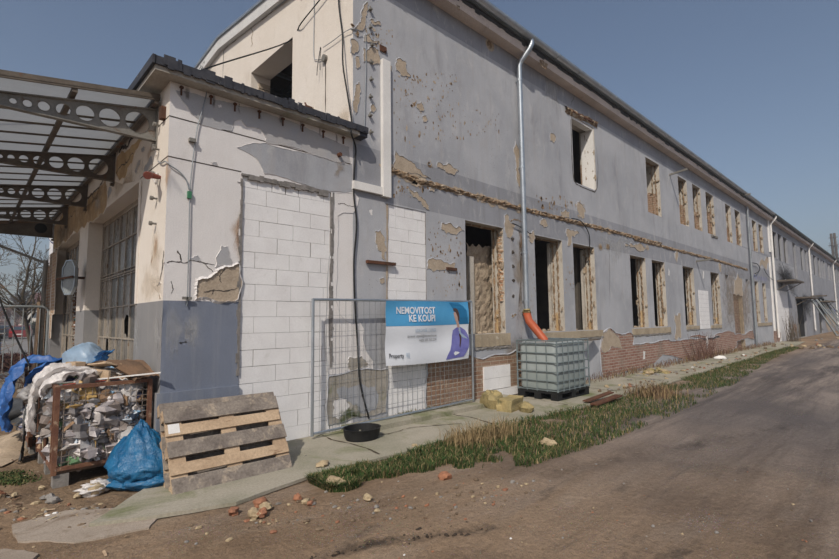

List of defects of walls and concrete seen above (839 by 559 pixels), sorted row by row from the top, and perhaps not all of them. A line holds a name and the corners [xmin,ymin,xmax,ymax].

peeling [350,2,393,69]
flaking render [115,139,157,181]
peeling [391,57,473,147]
spalling [457,0,839,263]
flaking render [49,181,112,339]
crack [157,251,237,294]
peeling [175,90,389,426]
peeling [375,151,458,299]
peeling [426,220,464,296]
flaking render [424,345,522,408]
flaking render [586,310,781,377]